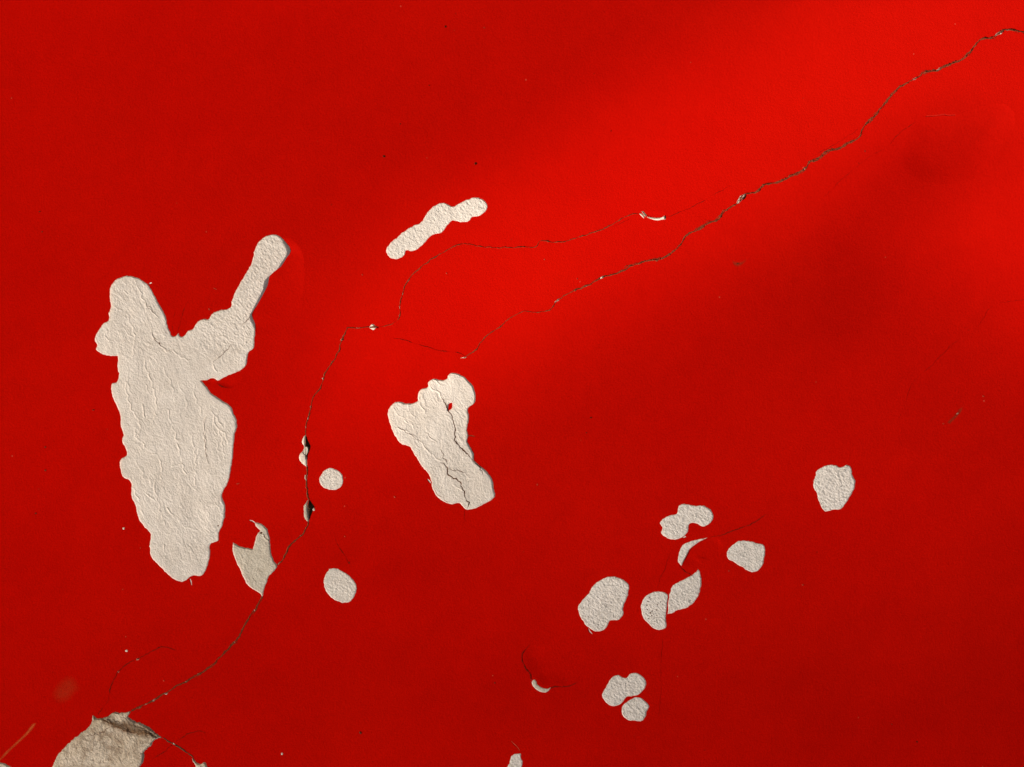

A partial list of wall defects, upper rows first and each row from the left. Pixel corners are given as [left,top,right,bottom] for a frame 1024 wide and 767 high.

peeling [386,197,487,259]
crack [277,28,1024,565]
peeling [95,234,291,596]
peeling [388,373,495,510]
peeling [813,465,855,511]
peeling [578,576,629,634]
peeling [641,570,702,630]
crack [98,646,175,714]
crack [132,596,263,711]
crack [521,647,580,688]
spalling [52,710,162,767]
crack [153,731,206,761]